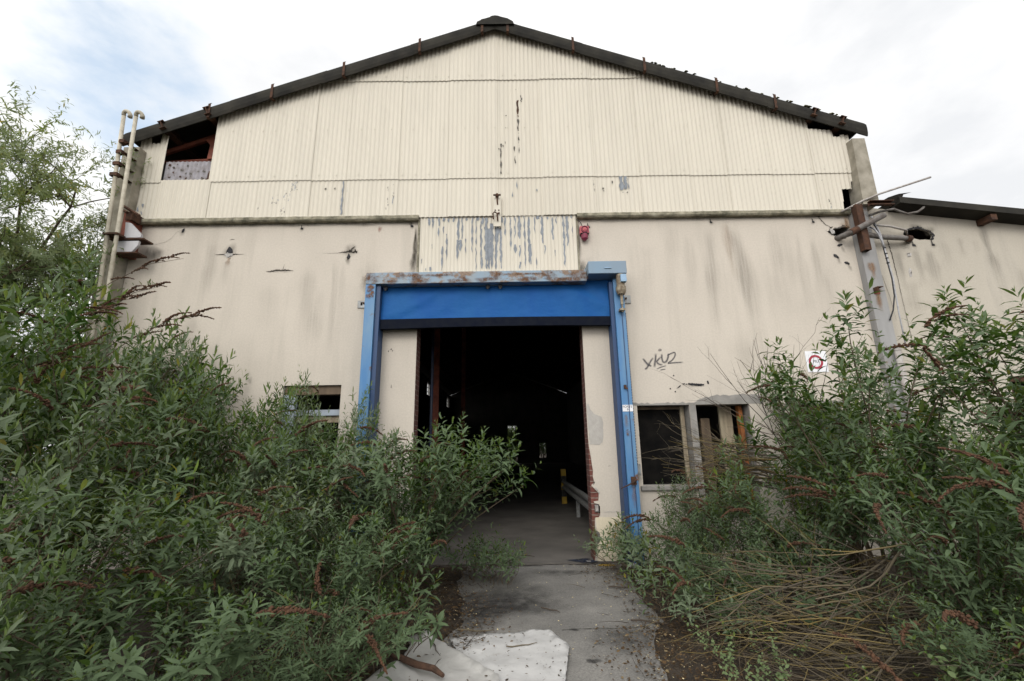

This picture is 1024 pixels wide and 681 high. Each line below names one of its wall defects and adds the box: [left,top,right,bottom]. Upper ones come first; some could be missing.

peeling [421,215,573,271]
corrosion [366,273,467,297]
corrosion [515,272,585,281]